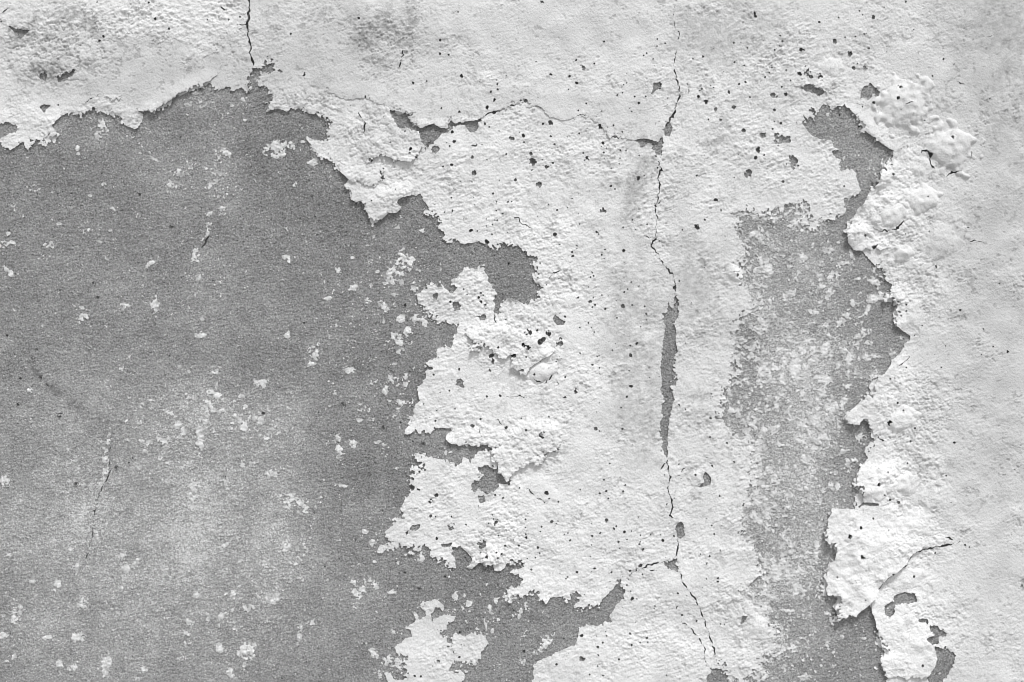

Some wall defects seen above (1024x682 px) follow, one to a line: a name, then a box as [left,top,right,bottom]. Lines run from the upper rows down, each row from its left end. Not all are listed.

crack [221,0,254,66]
crack [644,161,676,291]
peeling [0,56,642,682]
peeling [706,69,917,682]
crack [631,460,716,662]
crack [879,537,960,589]
peeling [919,618,956,682]